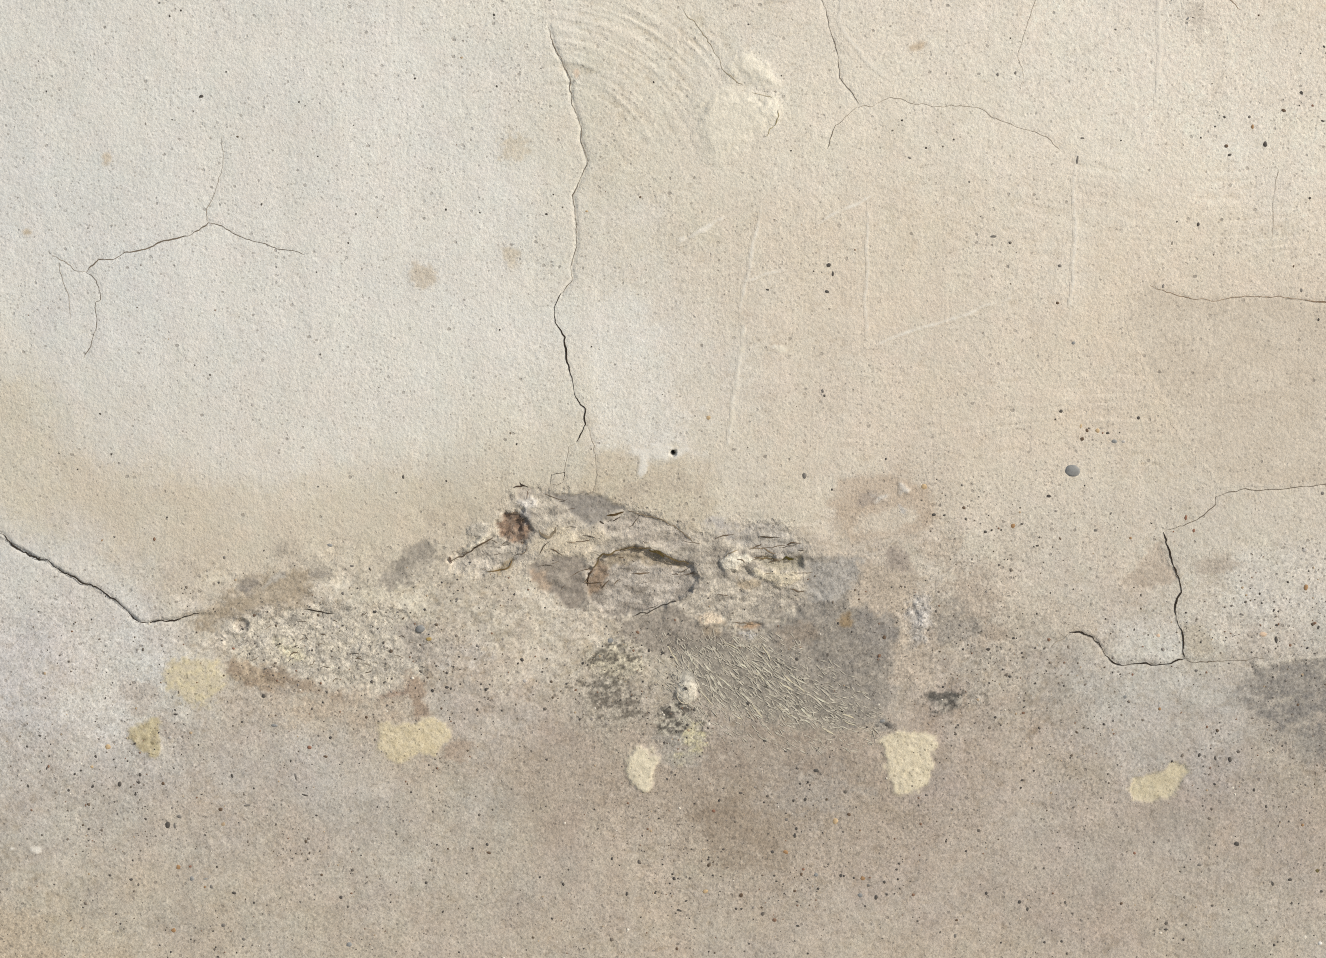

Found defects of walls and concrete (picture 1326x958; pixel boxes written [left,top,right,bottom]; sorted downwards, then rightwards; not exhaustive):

crack [823,3,1058,148]
crack [54,138,302,357]
crack [548,27,598,491]
crack [1152,286,1326,303]
crack [3,534,199,623]
water stain [184,535,336,637]
flaking render [207,481,814,691]
crack [1052,484,1326,666]
water stain [224,611,463,746]
water stain [440,461,1128,922]
water stain [1228,647,1326,777]